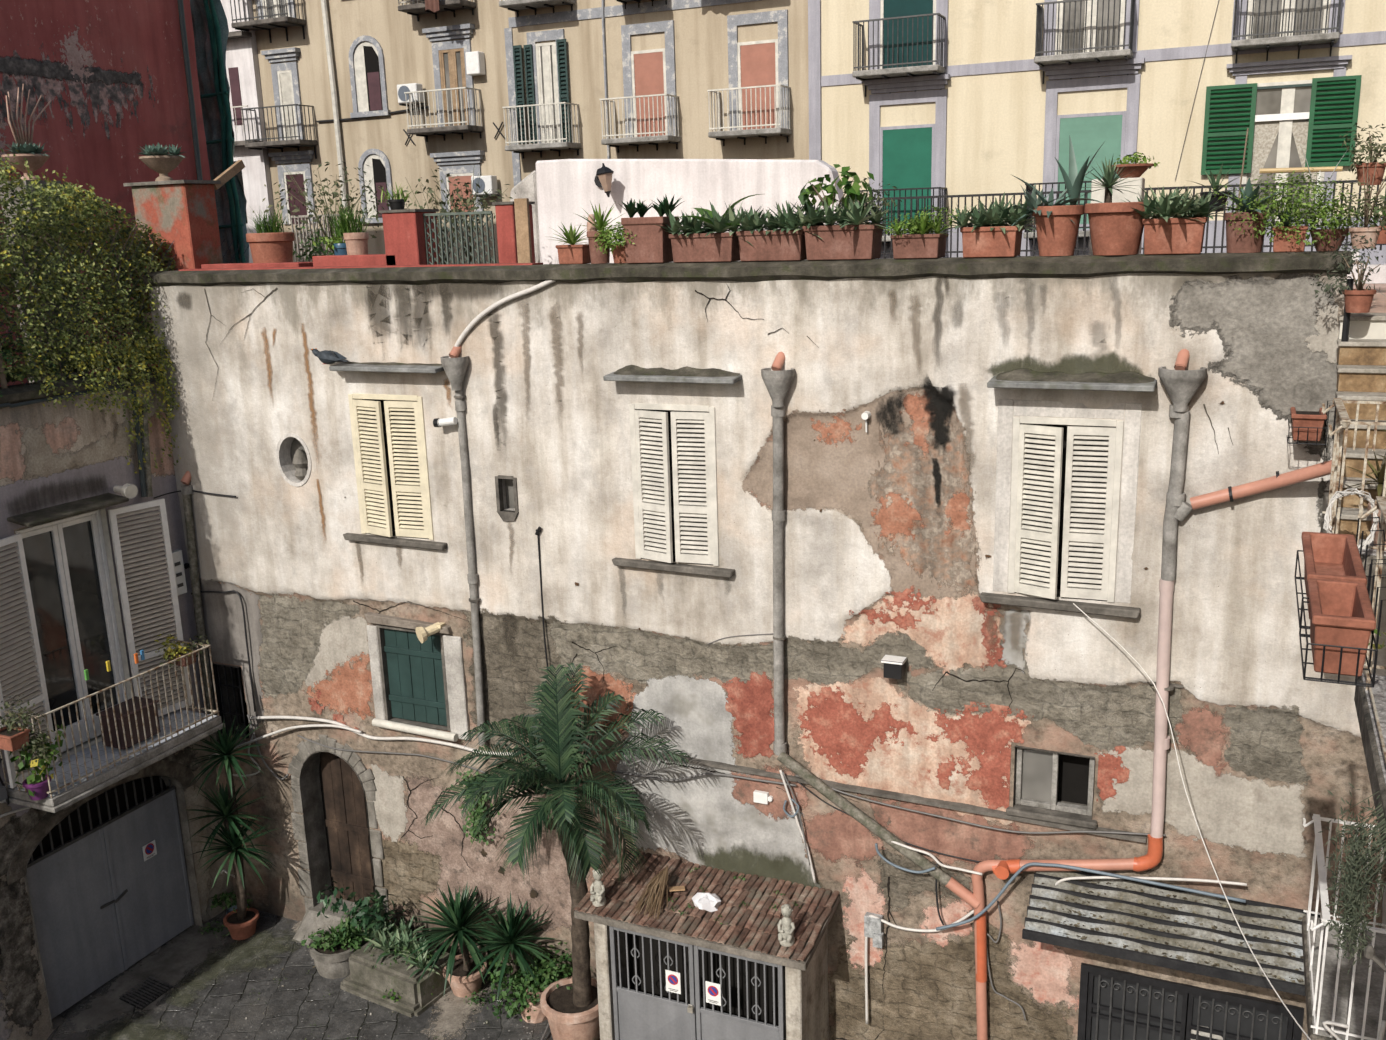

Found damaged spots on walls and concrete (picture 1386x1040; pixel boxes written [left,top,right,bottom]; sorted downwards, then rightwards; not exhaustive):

peeling [0,24,156,170]
peeling [0,423,27,481]
crack [204,287,277,395]
leakage [368,283,499,339]
leakage [490,315,506,438]
crack [695,285,819,348]
leakage [934,276,948,344]
flaking render [1169,273,1344,527]
flaking render [258,594,373,731]
flaking render [462,386,1311,1040]
flaking render [0,808,47,1036]